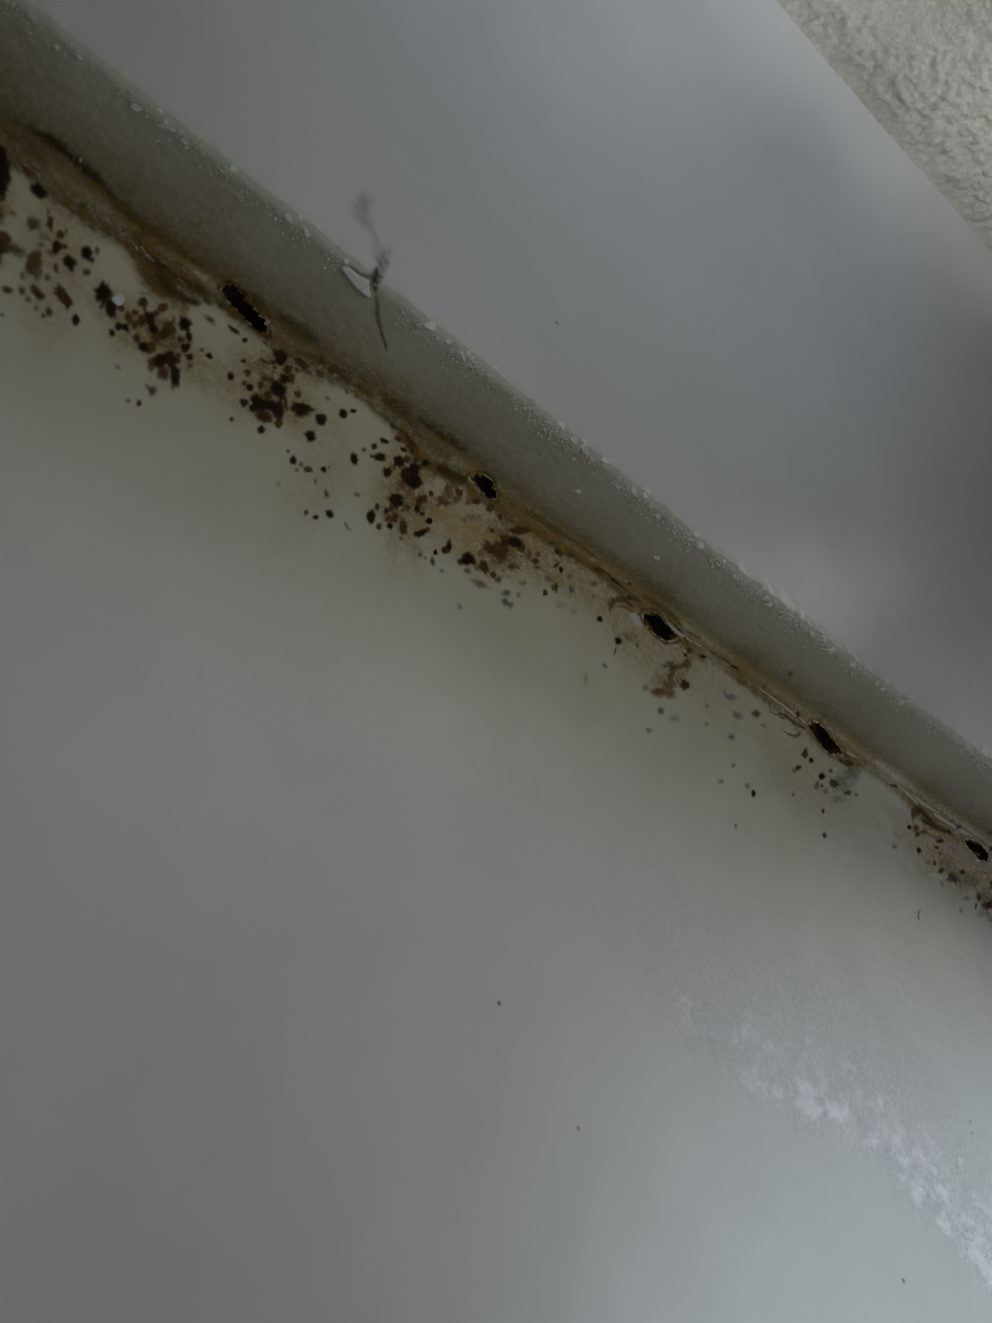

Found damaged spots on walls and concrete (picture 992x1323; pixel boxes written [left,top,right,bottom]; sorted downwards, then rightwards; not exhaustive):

water stain [0,146,247,406]
crack [342,266,386,347]
water stain [228,342,356,442]
water stain [287,449,333,520]
water stain [351,424,631,605]
water stain [652,648,706,713]
water stain [794,748,857,796]
water stain [908,824,992,909]